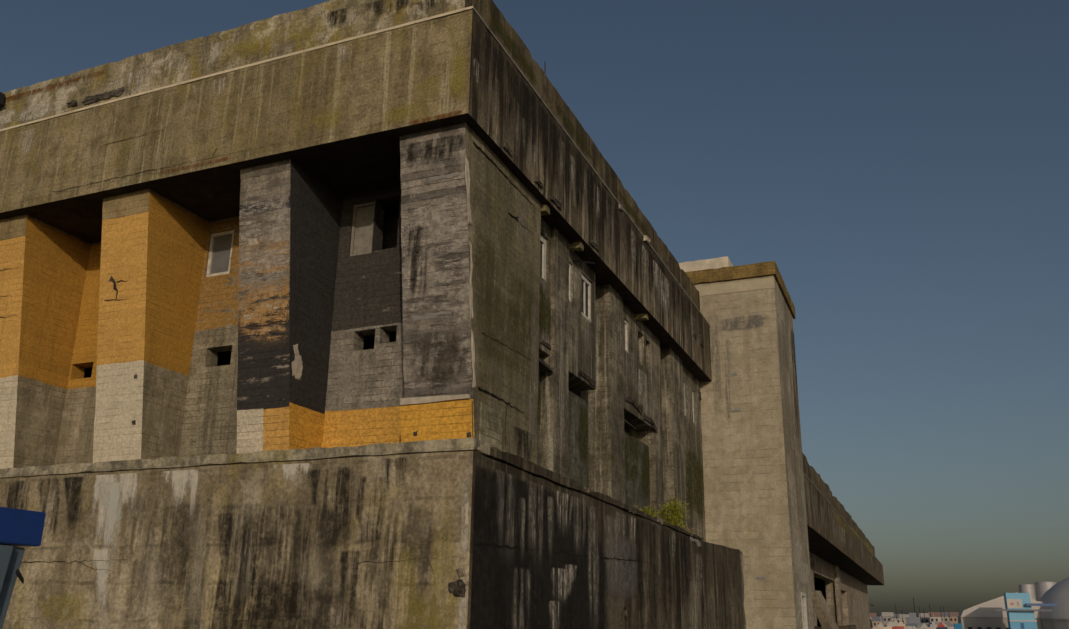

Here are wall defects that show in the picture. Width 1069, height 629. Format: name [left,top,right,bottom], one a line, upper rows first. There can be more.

water stain [474,32,693,333]
water stain [515,290,551,459]
crack [21,559,127,571]
water stain [145,469,359,629]
water stain [273,457,406,559]
water stain [470,468,704,629]
water stain [685,451,704,517]